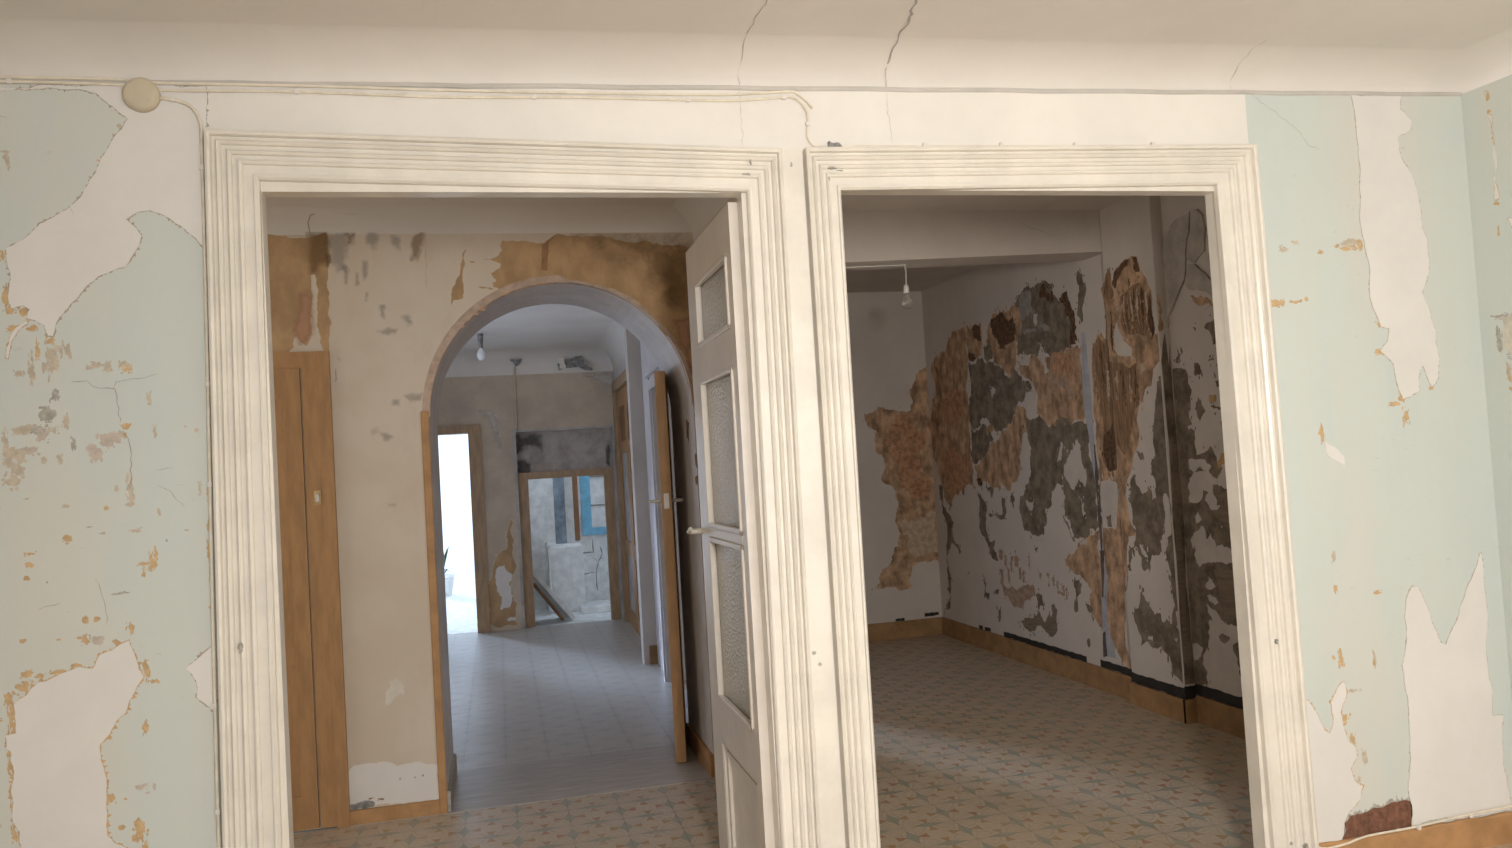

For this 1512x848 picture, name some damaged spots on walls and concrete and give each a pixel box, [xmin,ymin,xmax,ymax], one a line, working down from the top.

crack [885,0,918,140]
peeling [0,84,210,500]
peeling [267,233,331,353]
peeling [451,234,692,373]
peeling [1271,296,1308,308]
peeling [1317,95,1440,427]
peeling [1490,312,1512,390]
peeling [104,473,135,510]
peeling [137,539,168,578]
flaking render [864,209,1242,697]
peeling [0,615,160,848]
peeling [1290,552,1512,848]